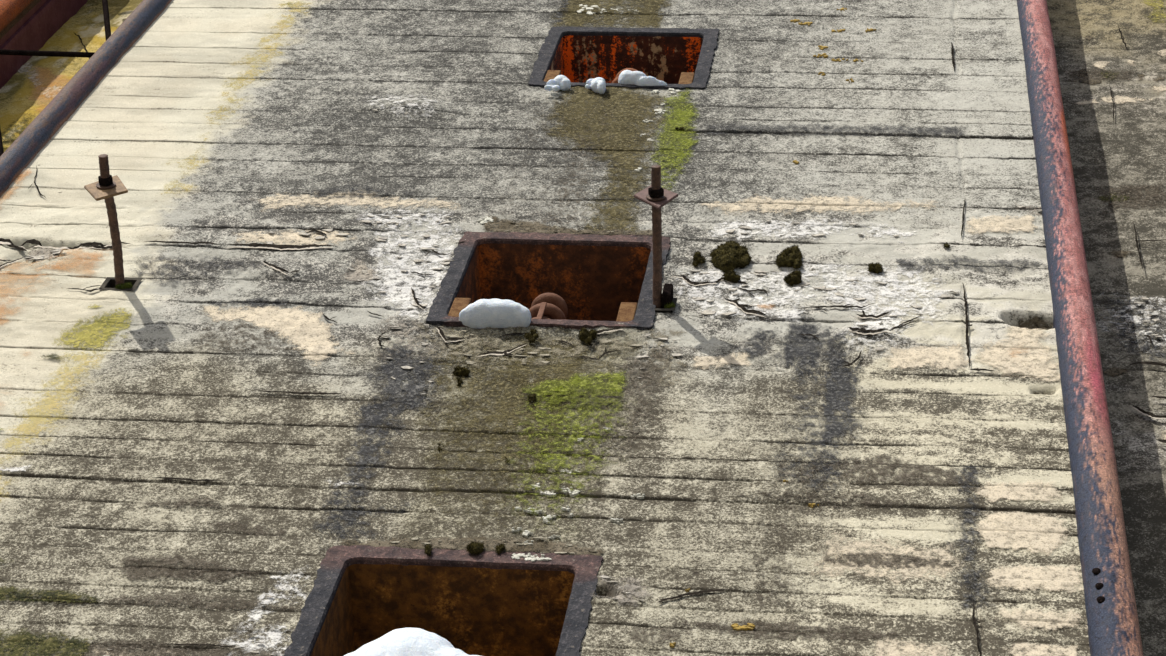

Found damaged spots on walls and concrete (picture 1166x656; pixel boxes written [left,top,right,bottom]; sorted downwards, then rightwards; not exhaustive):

water stain [550,0,671,28]
water stain [532,86,667,235]
crack [0,228,335,275]
crack [962,282,995,371]
water stain [312,327,674,540]
water stain [739,314,864,605]
crack [972,600,982,656]